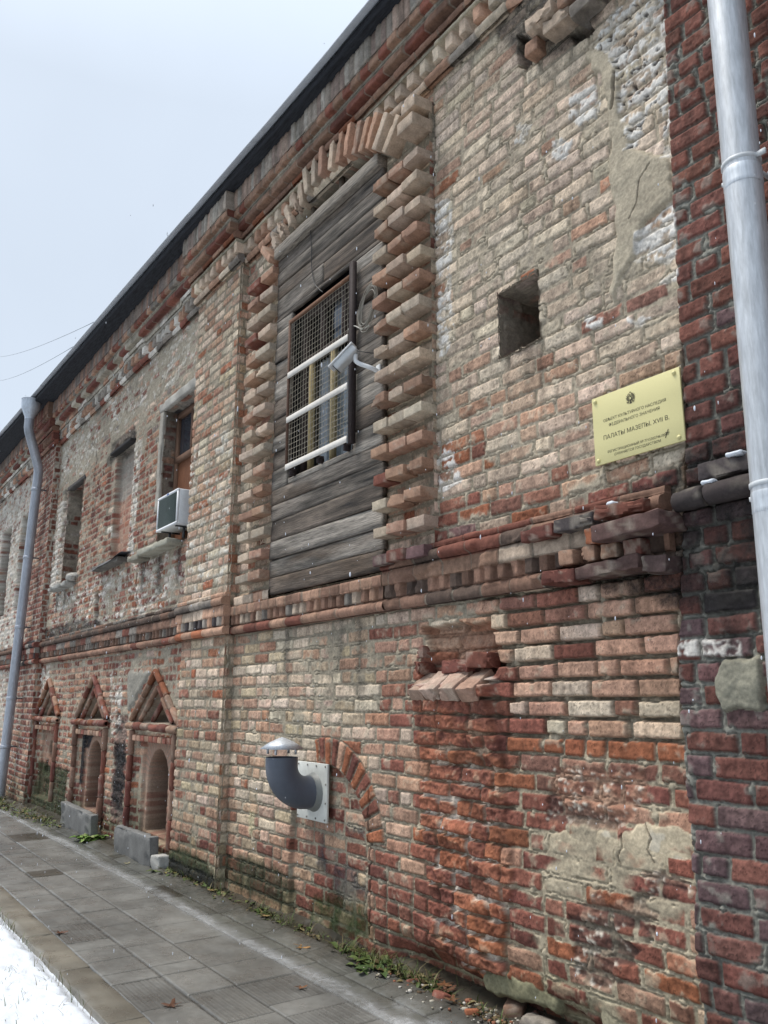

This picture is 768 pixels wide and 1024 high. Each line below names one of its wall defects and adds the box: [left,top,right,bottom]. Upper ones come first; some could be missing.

crack [628,160,652,219]
peeling [633,204,678,281]
spalling [547,765,648,831]
water stain [168,858,215,888]
crack [617,821,656,867]